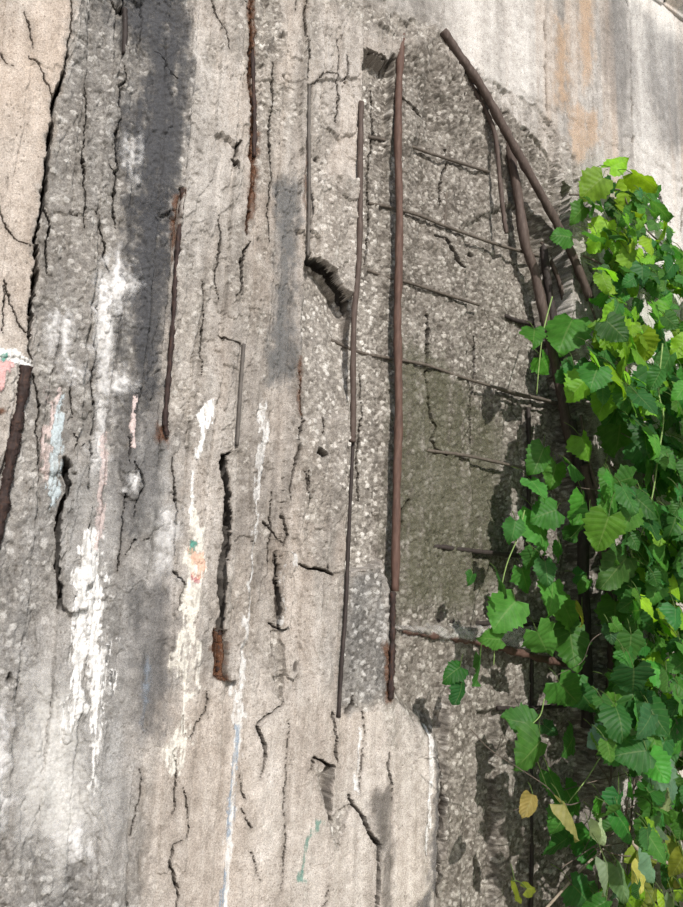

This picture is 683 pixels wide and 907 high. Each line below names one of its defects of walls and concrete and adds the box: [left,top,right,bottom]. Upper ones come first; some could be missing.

crack [0,0,127,609]
water stain [91,0,193,469]
rust [246,0,255,107]
rust [246,121,258,220]
spalling [250,0,292,193]
spalling [0,0,215,907]
efflorescence [157,508,177,567]
crack [262,371,325,630]
spalling [295,0,618,907]
rust [212,630,227,681]
crack [239,701,290,882]
crack [310,694,382,907]